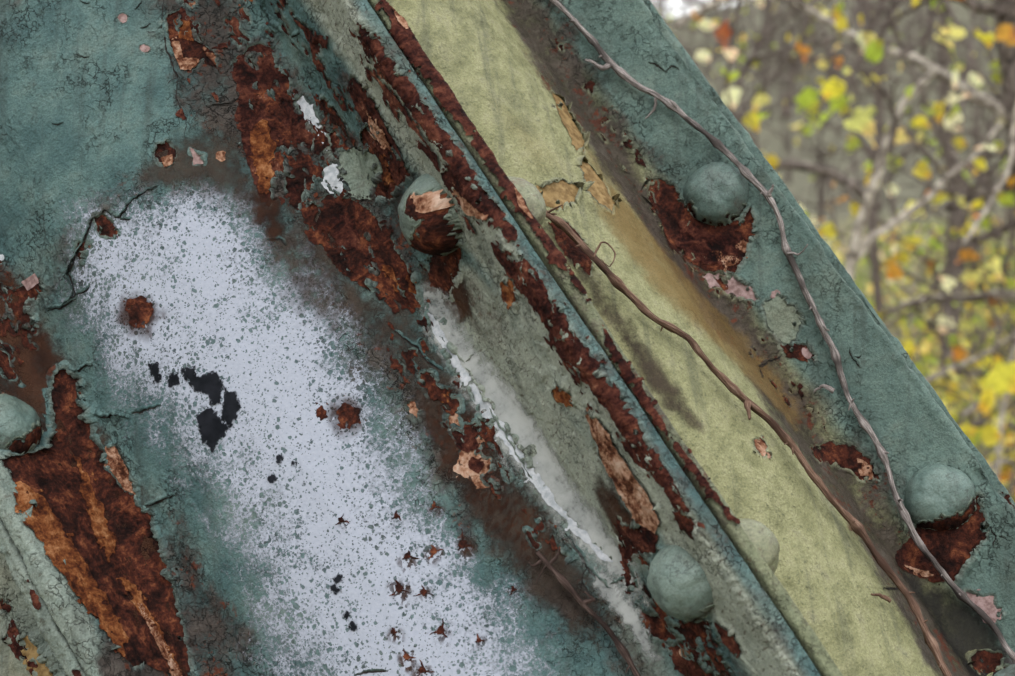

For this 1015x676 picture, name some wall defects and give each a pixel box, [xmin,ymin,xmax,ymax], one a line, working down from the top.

rust [594,113,673,220]
peeling [0,350,26,396]
peeling [1,272,51,337]
rust [0,275,77,468]
peeling [71,210,122,268]
peeling [118,295,155,337]
rust [173,0,601,565]
peeling [138,0,747,676]
rust [678,253,738,310]
rust [613,409,655,483]
peeling [0,359,205,676]
rust [595,479,736,676]